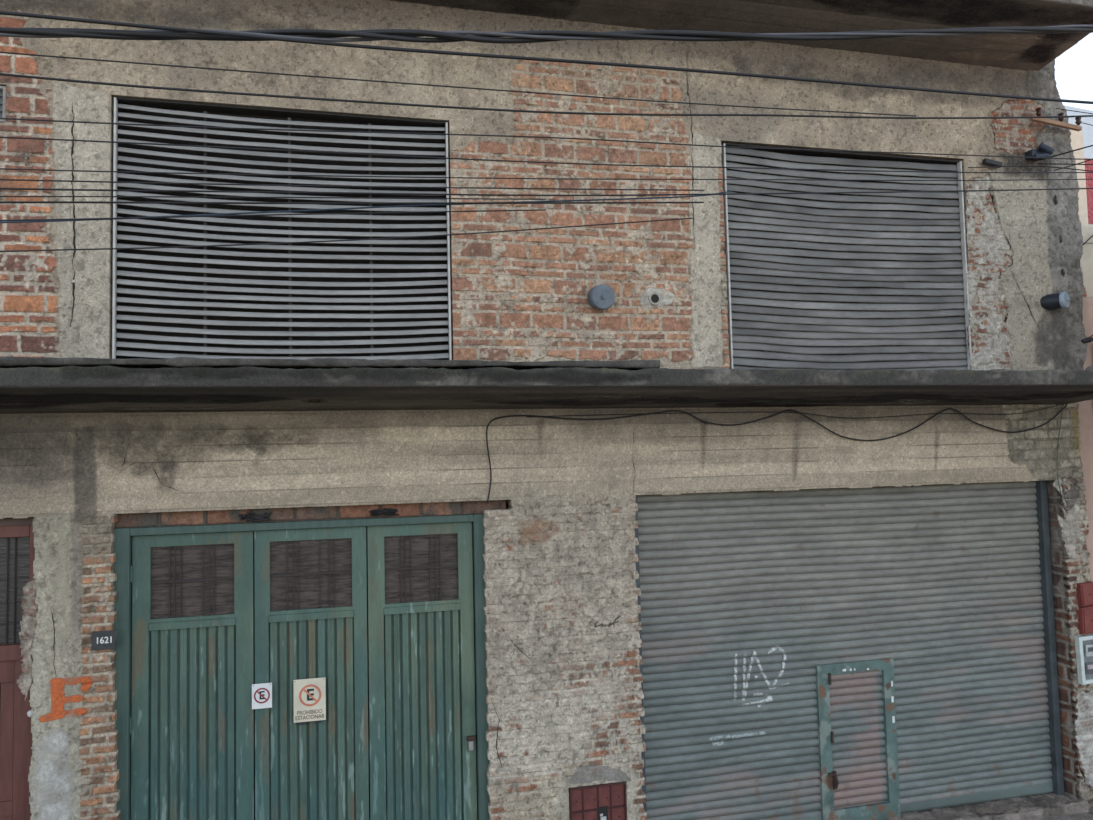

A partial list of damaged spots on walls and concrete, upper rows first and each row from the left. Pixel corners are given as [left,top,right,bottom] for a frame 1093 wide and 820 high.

water stain [493,0,574,17]
water stain [790,0,1093,100]
flaking render [991,96,1045,156]
spalling [648,292,661,305]
flaking render [966,173,1013,370]
water stain [0,394,290,409]
water stain [75,428,177,522]
peeling [1053,477,1090,563]
peeling [1075,691,1093,786]